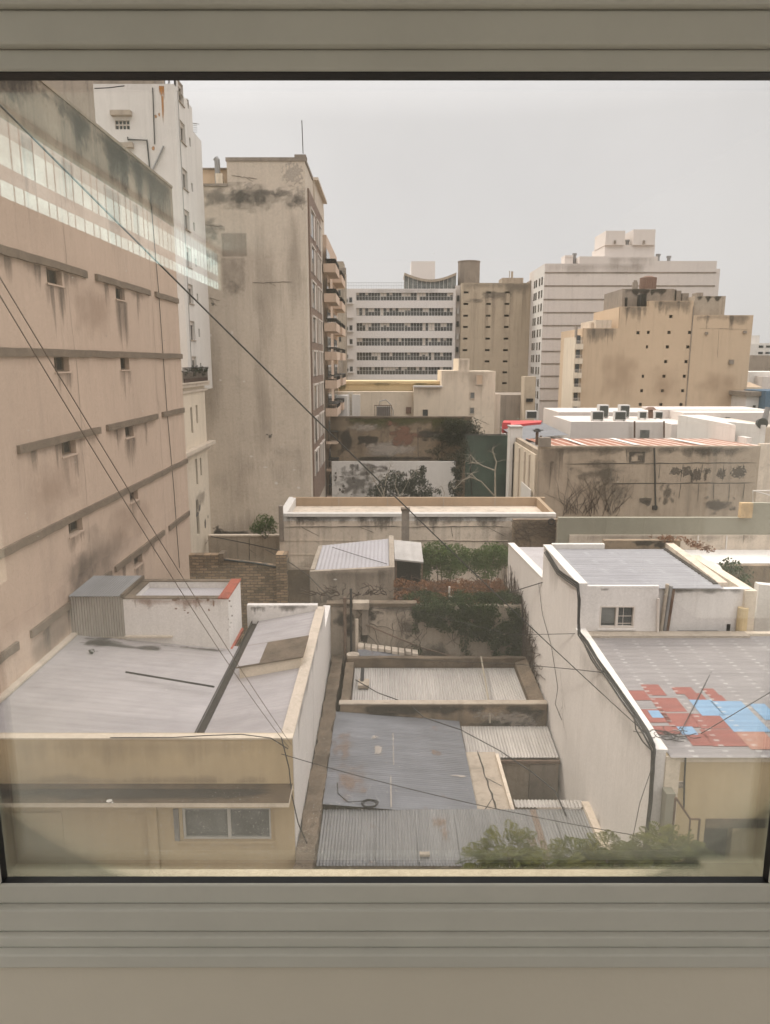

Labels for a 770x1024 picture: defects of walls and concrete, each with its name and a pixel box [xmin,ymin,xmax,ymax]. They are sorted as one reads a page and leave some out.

damp [106,140,168,204]
damp [340,420,404,449]
damp [345,457,432,493]
damp [707,500,735,514]